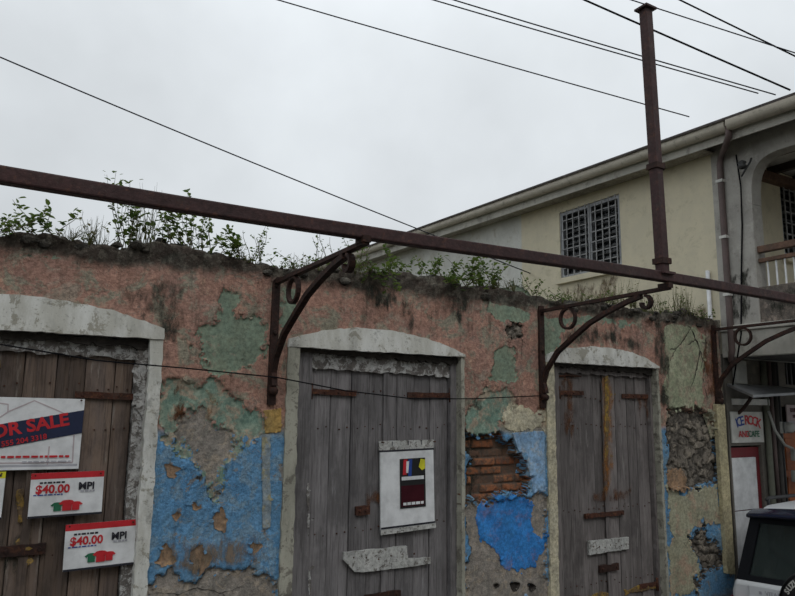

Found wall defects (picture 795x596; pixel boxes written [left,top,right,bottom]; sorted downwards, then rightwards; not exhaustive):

peeling [279,282,296,327]
peeling [132,348,150,419]
peeling [159,288,277,533]
flaking render [456,281,549,596]
flaking render [664,401,718,492]
flaking render [147,539,278,596]
flaking render [687,519,723,596]